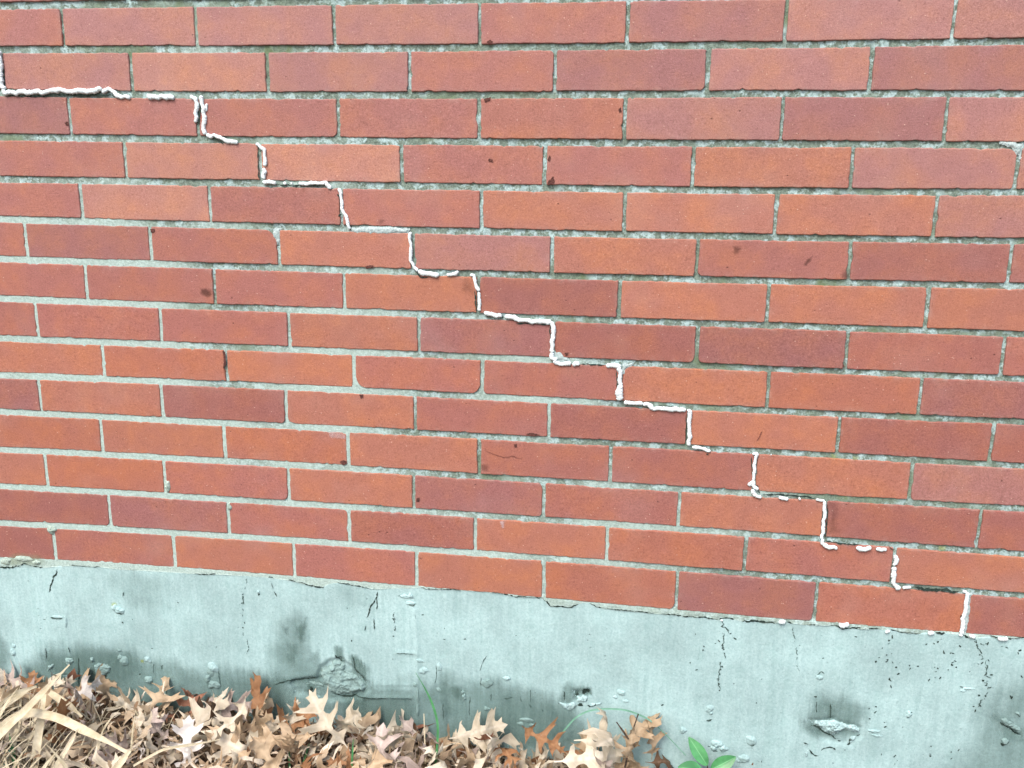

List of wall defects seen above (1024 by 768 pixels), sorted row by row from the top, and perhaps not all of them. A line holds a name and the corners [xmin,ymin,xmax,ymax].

crack [0,51,711,455]
crack [0,563,99,592]
crack [239,576,396,652]
crack [491,432,1024,707]
water stain [336,650,366,681]